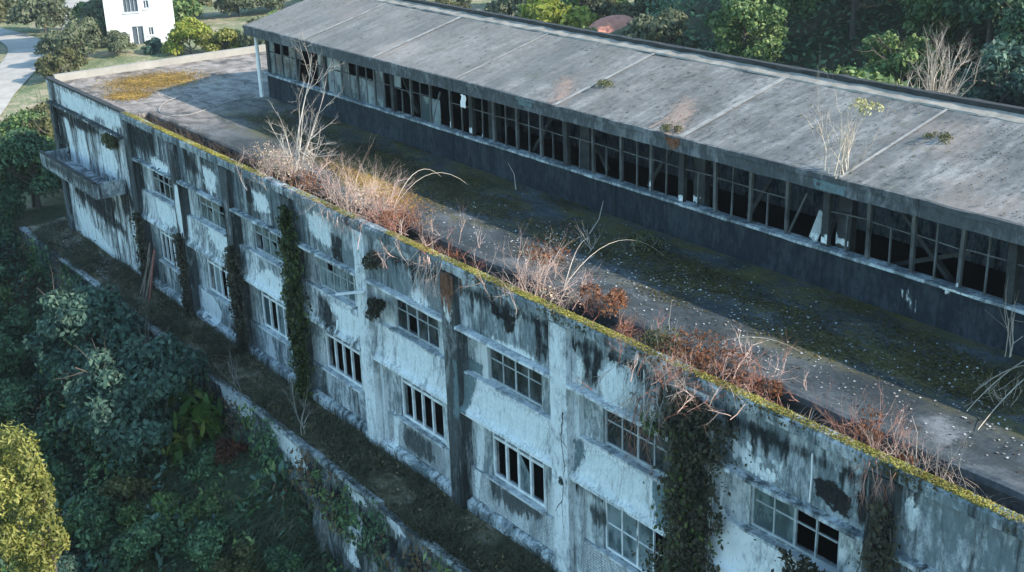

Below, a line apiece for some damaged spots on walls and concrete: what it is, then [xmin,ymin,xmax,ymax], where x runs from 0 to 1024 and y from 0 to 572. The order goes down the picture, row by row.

corrosion [649,100,695,150]
water stain [45,100,134,243]
corrosion [440,268,461,317]
water stain [460,284,549,371]
water stain [572,337,668,388]
water stain [725,408,827,468]
crack [555,412,566,530]